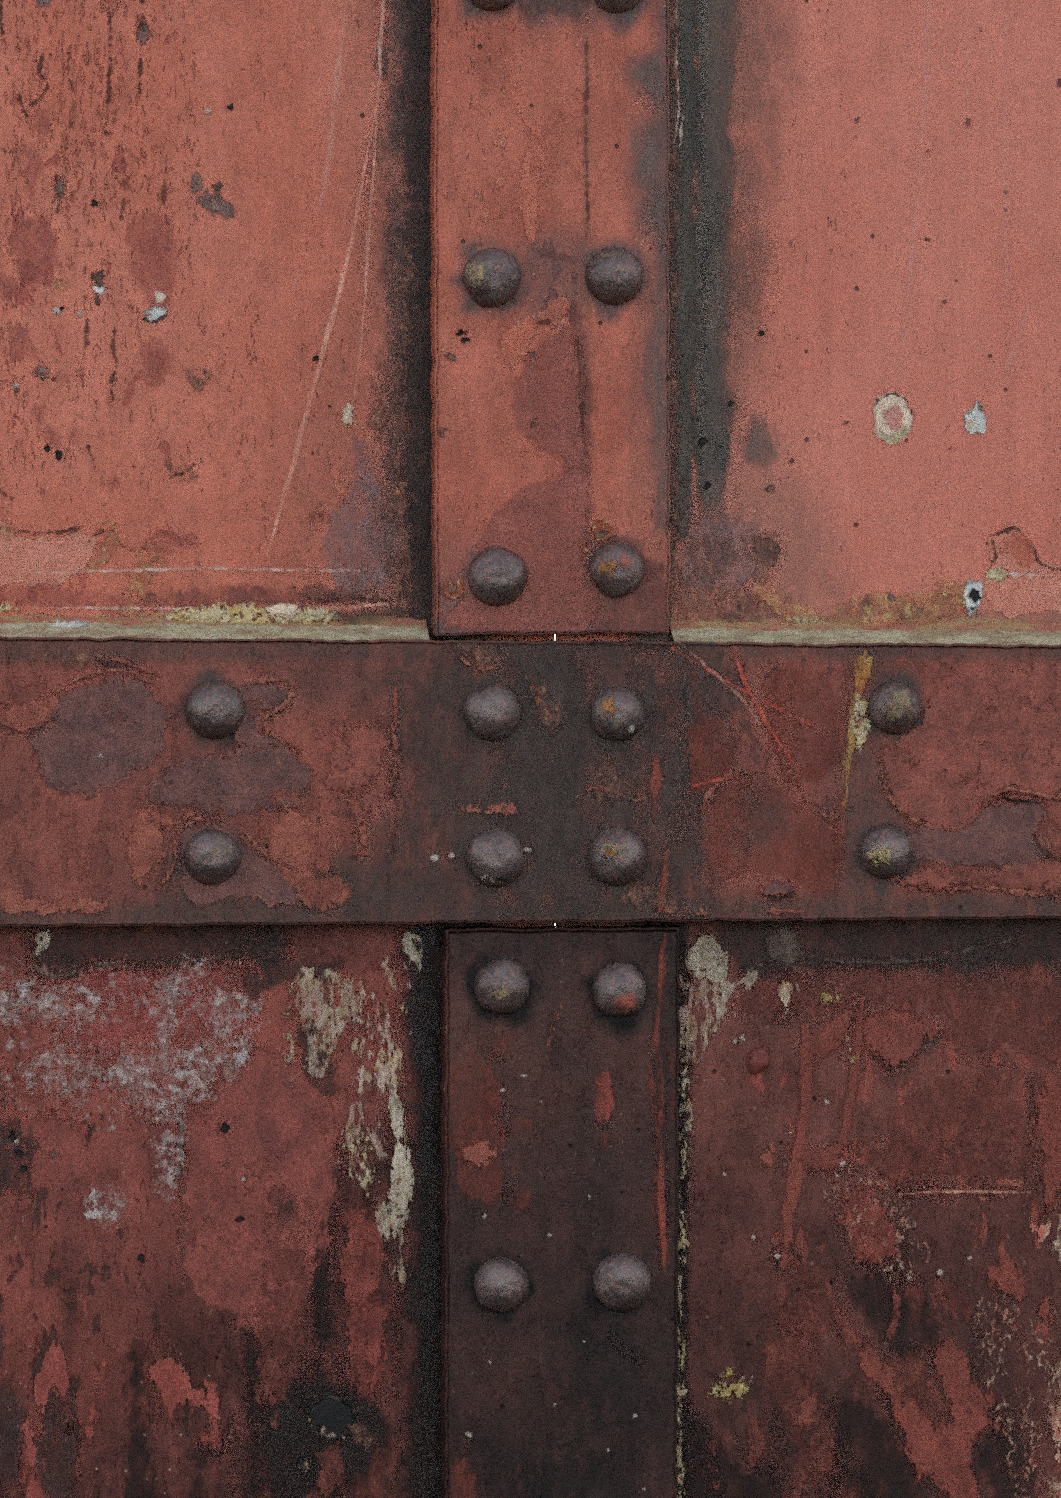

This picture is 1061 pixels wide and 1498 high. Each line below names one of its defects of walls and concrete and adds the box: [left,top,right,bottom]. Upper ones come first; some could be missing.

rust [668,0,696,640]
water stain [686,0,781,534]
peeling [873,392,913,444]
rust [743,530,963,627]
rust [986,567,1009,583]
peeling [962,526,1061,619]
peeling [877,662,1061,904]
peeling [0,888,108,918]
peeling [78,938,343,1048]
peeling [1029,1074,1061,1262]
peeling [176,1047,391,1498]
peeling [740,1254,1061,1498]